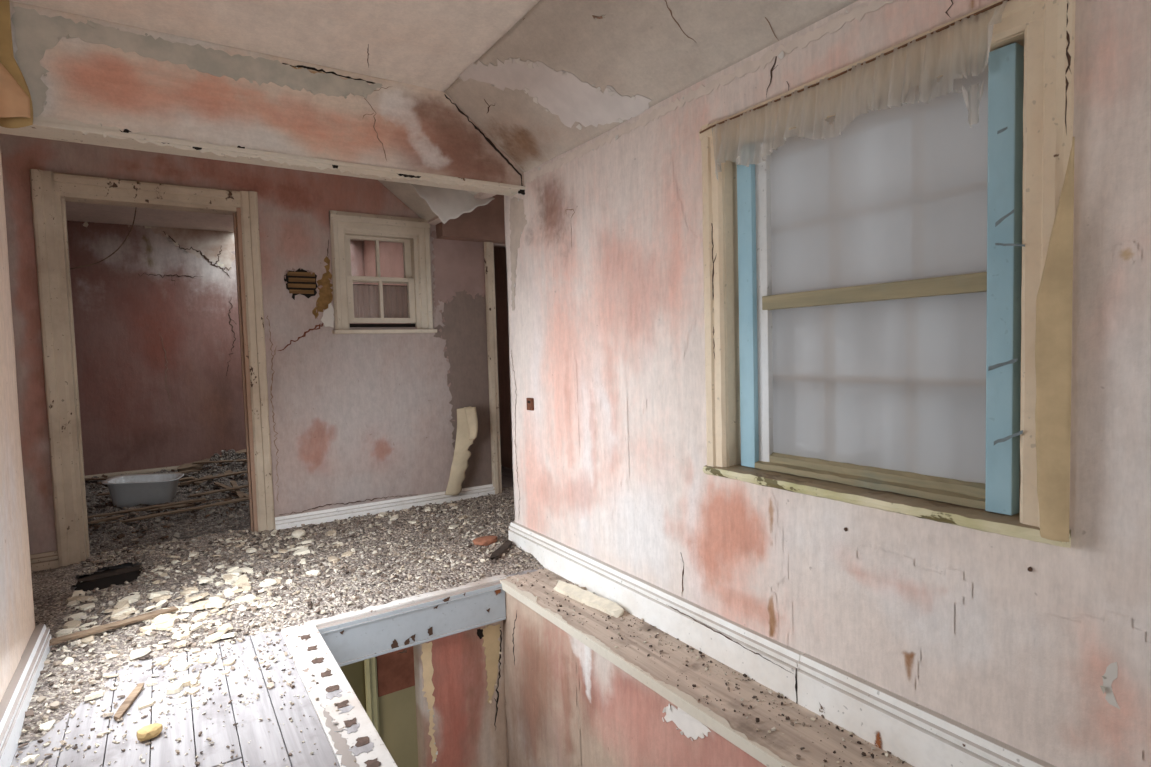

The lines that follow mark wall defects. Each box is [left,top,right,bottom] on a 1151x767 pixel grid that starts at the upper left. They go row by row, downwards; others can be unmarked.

crack [665,0,693,40]
peeling [0,0,525,195]
crack [282,44,388,160]
peeling [458,57,652,130]
crack [138,231,237,376]
flaking render [284,256,334,328]
leakage [43,37,704,541]
crack [267,315,418,515]
flaking render [434,289,492,488]
leakage [655,441,793,646]
flaking render [662,704,711,741]